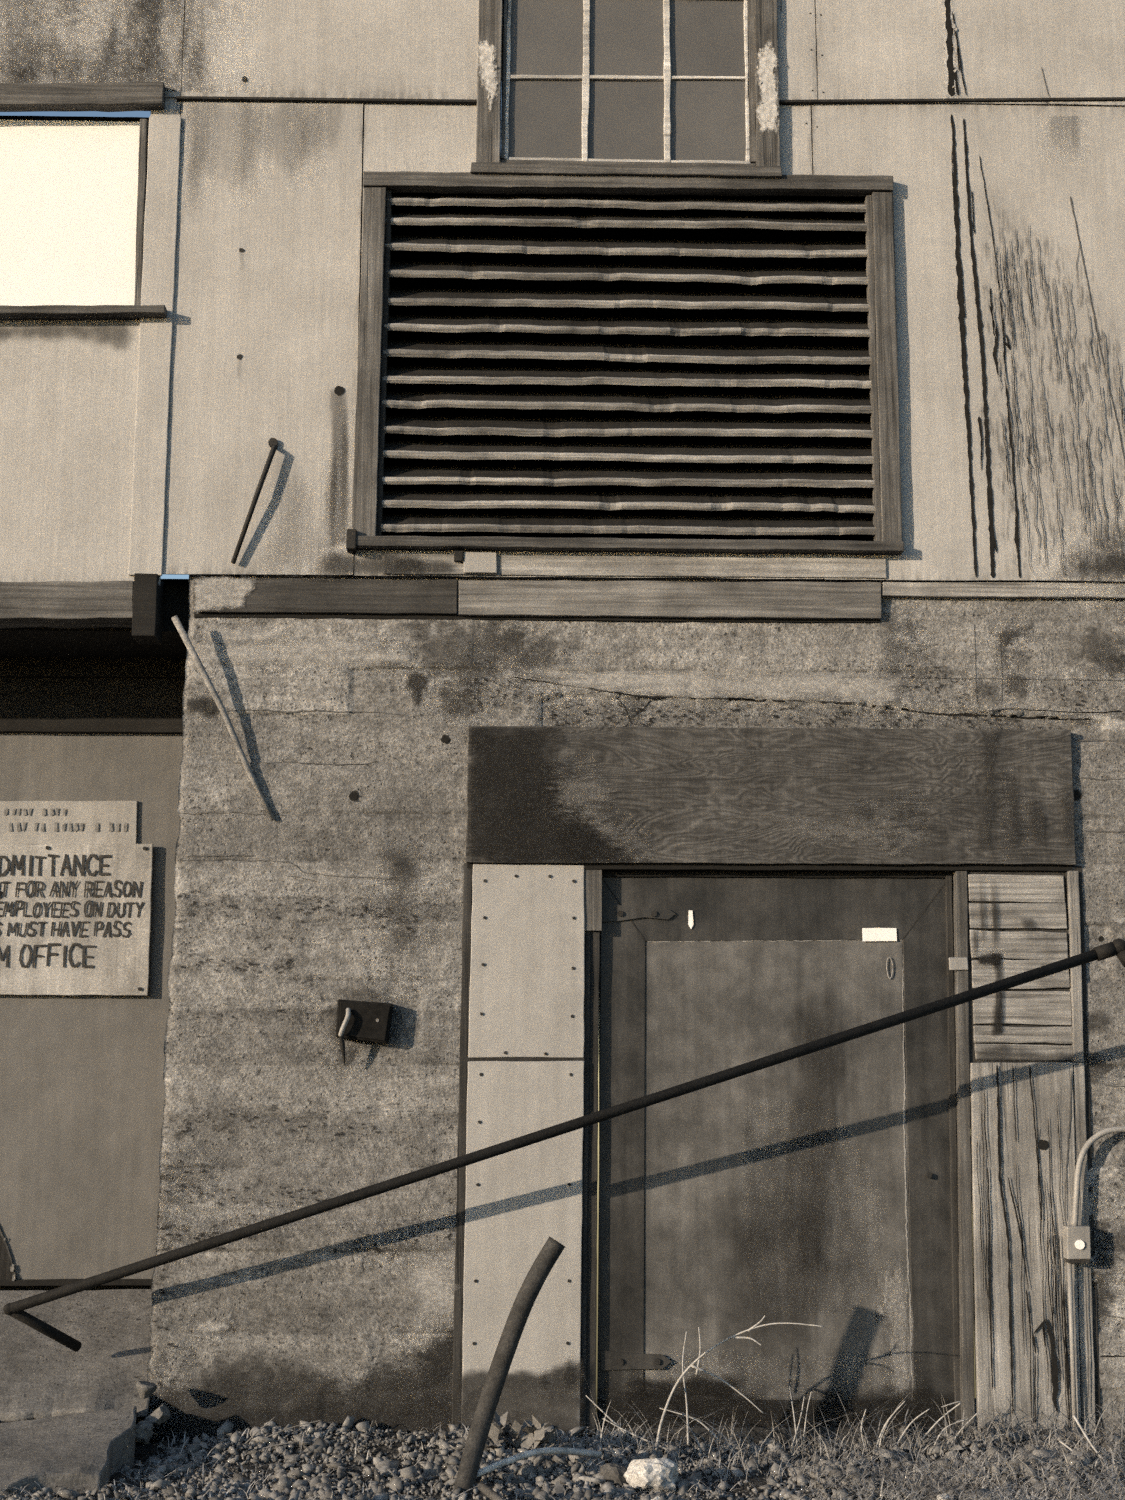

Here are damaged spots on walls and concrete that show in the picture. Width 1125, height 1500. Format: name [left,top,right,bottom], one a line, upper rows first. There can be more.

damp [9,0,163,83]
peeling [477,40,497,110]
peeling [756,42,779,132]
damp [204,620,622,862]
peeling [0,1230,16,1281]
crack [977,1065,1125,1430]